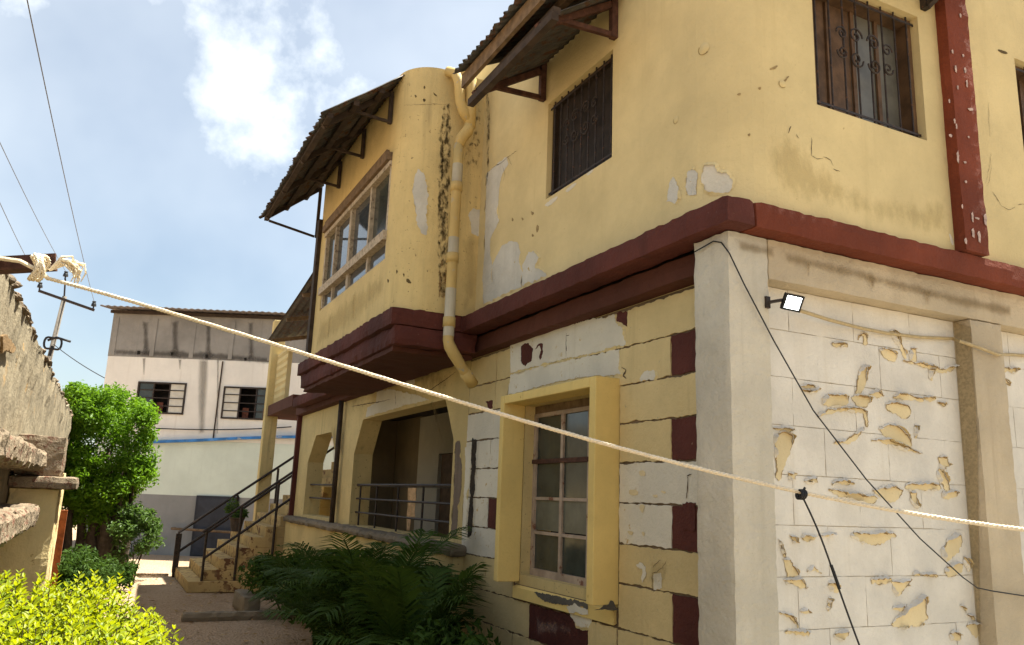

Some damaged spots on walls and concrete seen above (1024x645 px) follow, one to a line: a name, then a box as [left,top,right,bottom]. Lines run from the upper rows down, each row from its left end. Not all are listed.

peeling [411,169,429,235]
leakage [438,104,451,292]
peeling [468,157,547,306]
peeling [667,162,736,205]
peeling [949,204,987,245]
leakage [117,323,269,422]
peeling [800,364,948,454]
peeling [832,329,960,381]
peeling [773,426,960,509]
spalling [534,592,618,631]
peeling [779,531,841,611]
peeling [871,532,974,630]